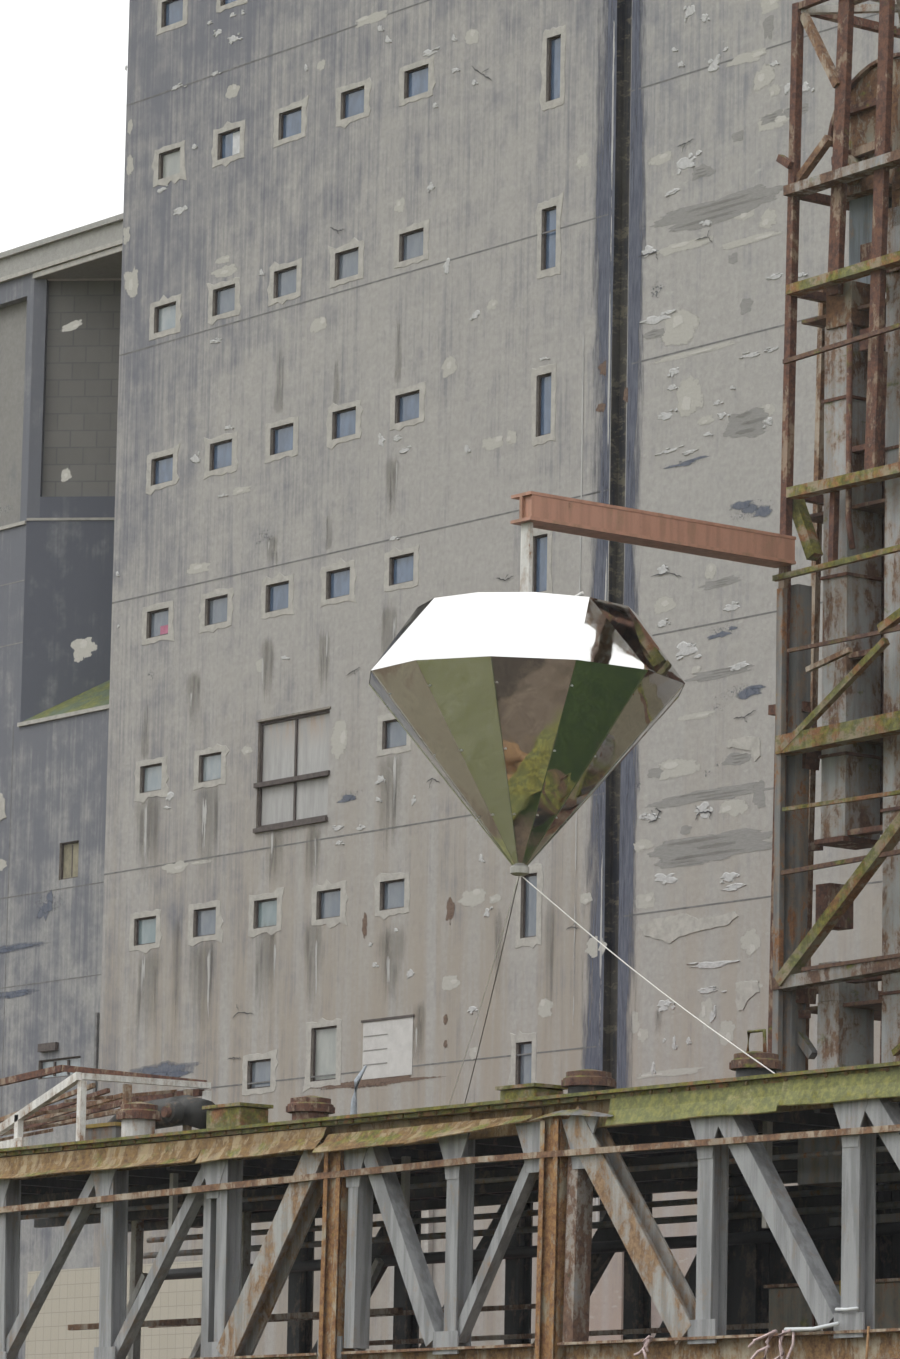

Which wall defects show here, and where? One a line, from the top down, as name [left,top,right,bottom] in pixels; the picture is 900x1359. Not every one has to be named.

spalling [207,10,245,45]
spalling [751,50,815,95]
spalling [659,150,702,197]
spalling [642,241,689,259]
spalling [676,641,702,670]
spalling [694,801,732,819]
spalling [720,872,745,892]
spalling [688,944,755,969]